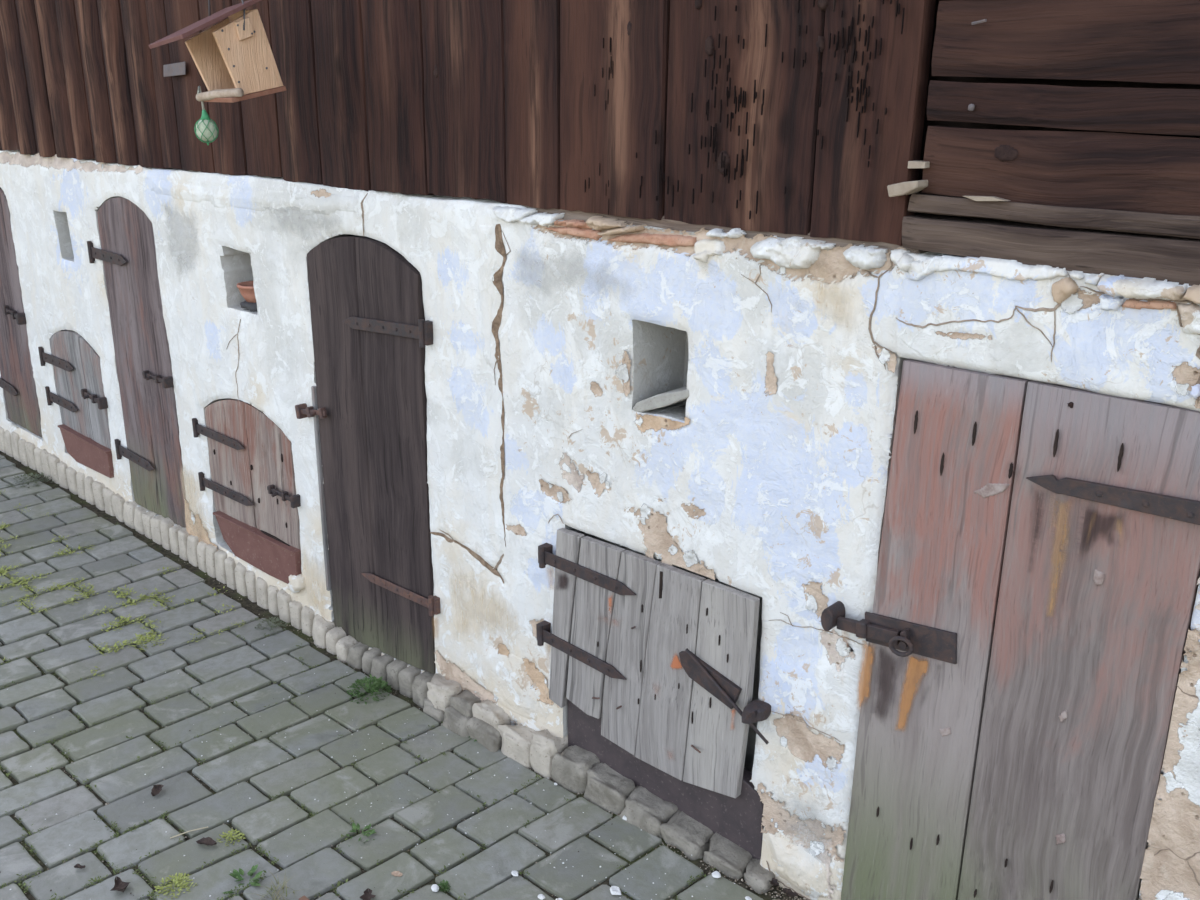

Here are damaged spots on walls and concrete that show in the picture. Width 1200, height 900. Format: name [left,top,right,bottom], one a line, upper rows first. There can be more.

flaking render [531,223,907,284]
crack [857,250,1200,404]
crack [430,224,511,584]
flaking render [1172,362,1200,409]
flaking render [624,498,715,580]
corrosion [858,645,928,729]
flaking render [1139,628,1200,900]